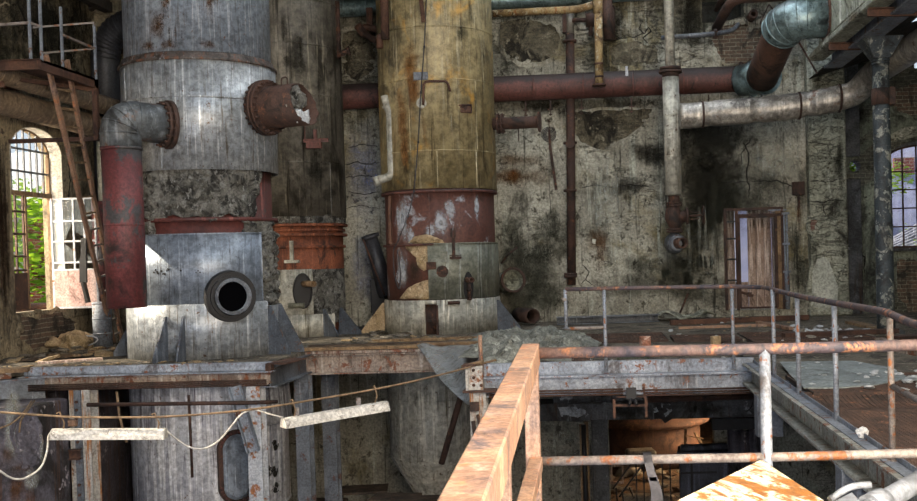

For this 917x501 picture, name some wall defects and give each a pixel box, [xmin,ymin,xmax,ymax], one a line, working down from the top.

corrosion [143,0,182,50]
spalling [493,15,564,69]
corrosion [398,56,419,129]
spalling [575,106,657,153]
peeling [397,203,414,242]
peeling [427,202,454,235]
damp [606,180,642,202]
damp [630,124,763,300]
peeling [397,257,418,282]
damp [794,259,808,303]